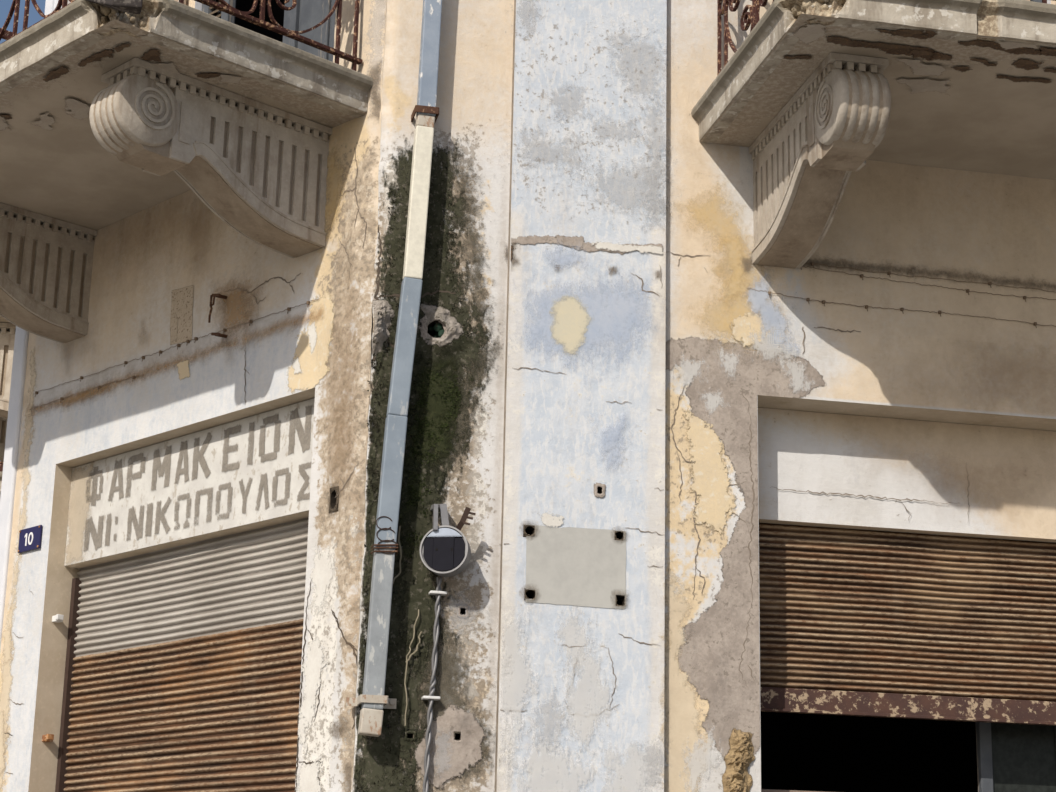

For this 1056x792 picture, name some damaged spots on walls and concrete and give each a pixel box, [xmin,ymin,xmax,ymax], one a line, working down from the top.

spalling [43,43,130,82]
spalling [784,0,1056,94]
flaking render [287,290,334,393]
spalling [418,304,464,347]
crack [511,235,709,295]
water stain [360,341,387,663]
water stain [396,152,502,781]
crack [654,387,705,598]
flaking render [665,330,825,792]
crack [727,393,970,681]
crack [295,579,357,792]
water stain [332,680,365,792]